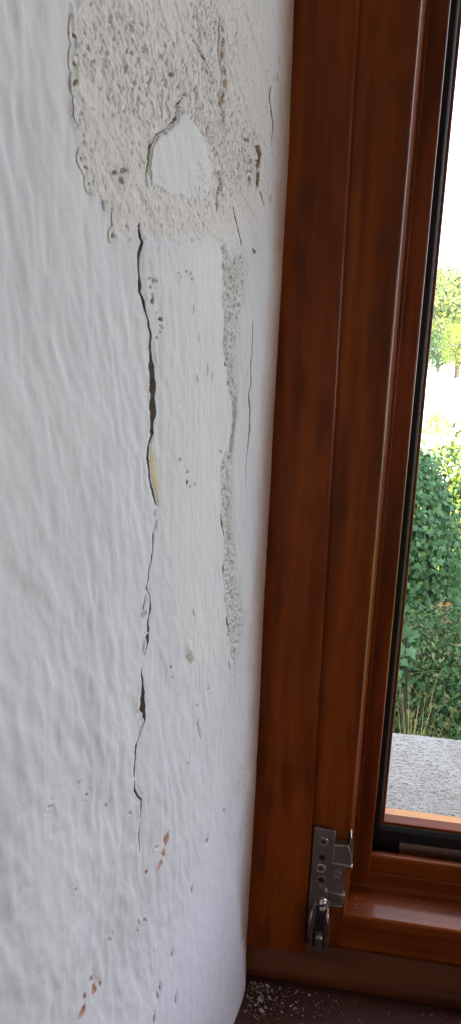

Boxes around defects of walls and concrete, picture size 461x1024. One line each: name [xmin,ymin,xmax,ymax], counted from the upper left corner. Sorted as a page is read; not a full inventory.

crack [132,220,158,857]
flaking render [68,0,294,696]
crack [244,322,254,490]